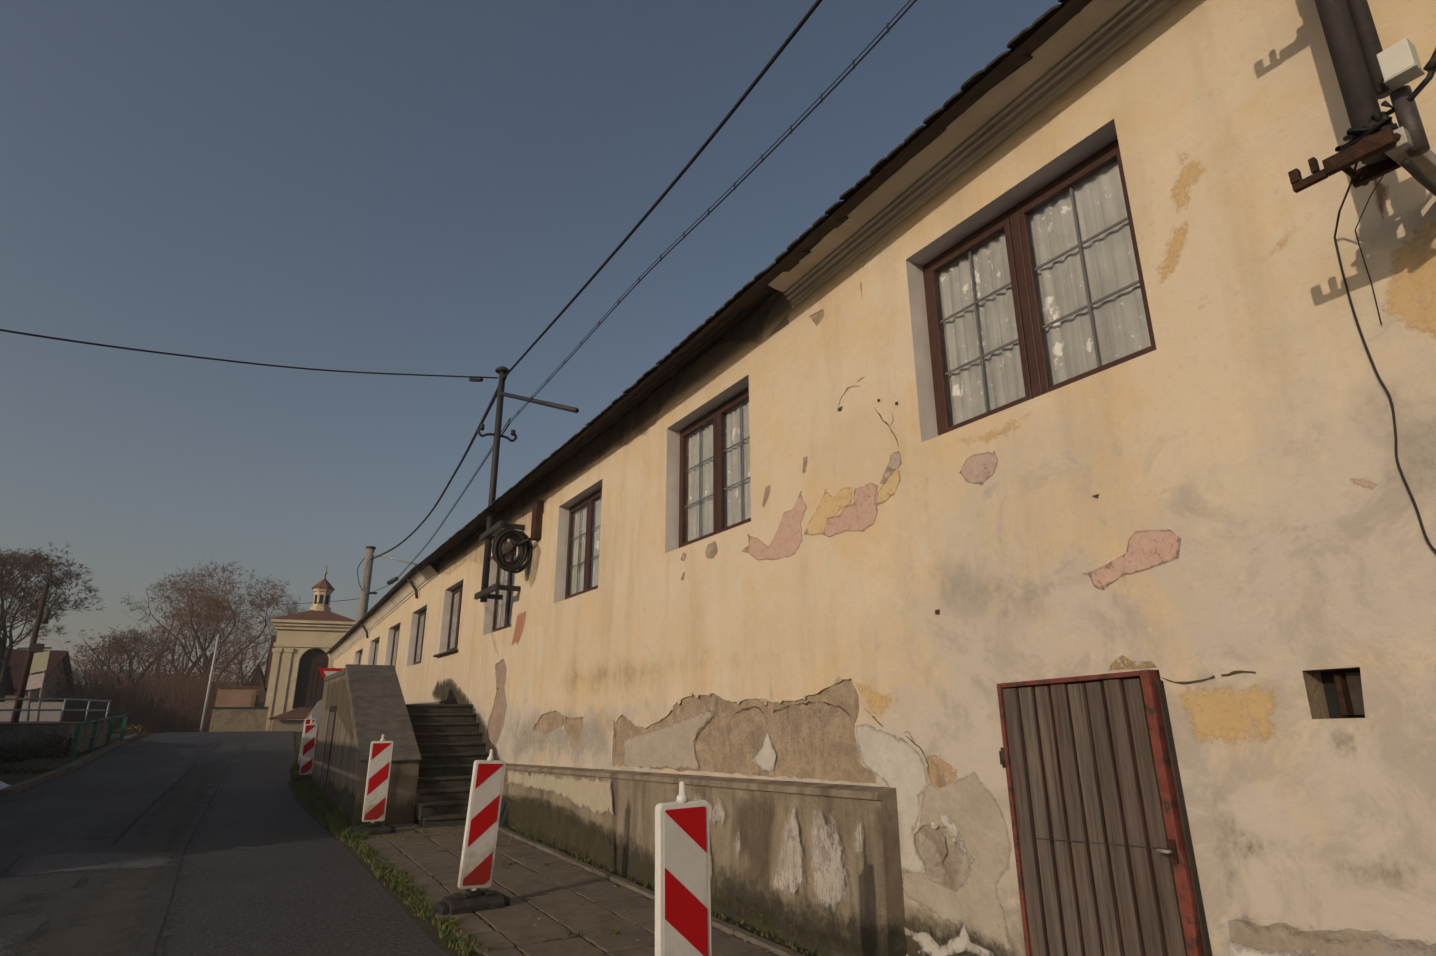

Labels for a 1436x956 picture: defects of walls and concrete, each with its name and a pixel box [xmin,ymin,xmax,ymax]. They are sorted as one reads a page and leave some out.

peeling [959,421,1016,485]
peeling [742,450,902,561]
peeling [1083,529,1181,590]
spalling [488,660,507,746]
spalling [534,711,584,749]
spalling [611,676,891,783]
spalling [924,755,959,788]
leakage [694,794,882,909]
spalling [916,822,972,891]